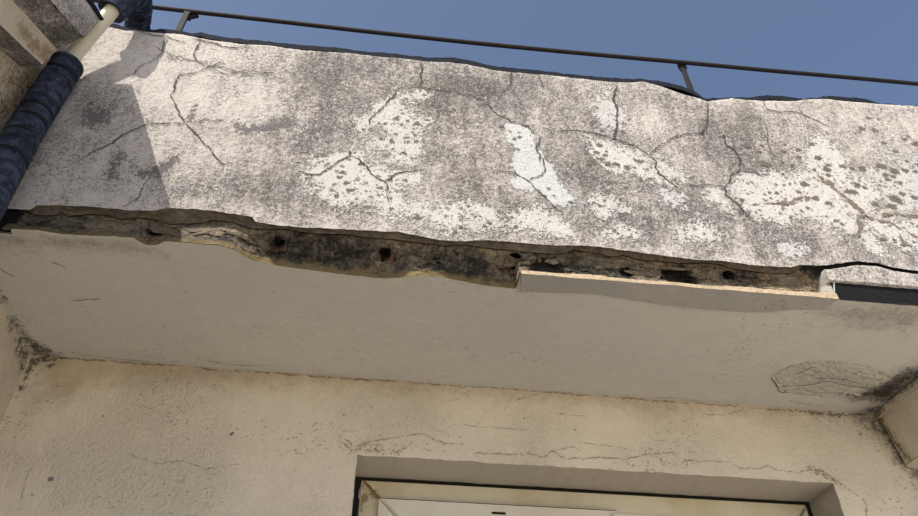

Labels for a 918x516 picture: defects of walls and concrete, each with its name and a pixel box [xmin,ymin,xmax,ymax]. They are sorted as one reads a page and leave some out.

crack [82,28,273,207]
crack [302,150,422,202]
spalling [2,82,918,313]
crack [368,62,918,246]
crack [802,261,918,276]
leakage [7,316,64,380]
leakage [839,367,918,464]